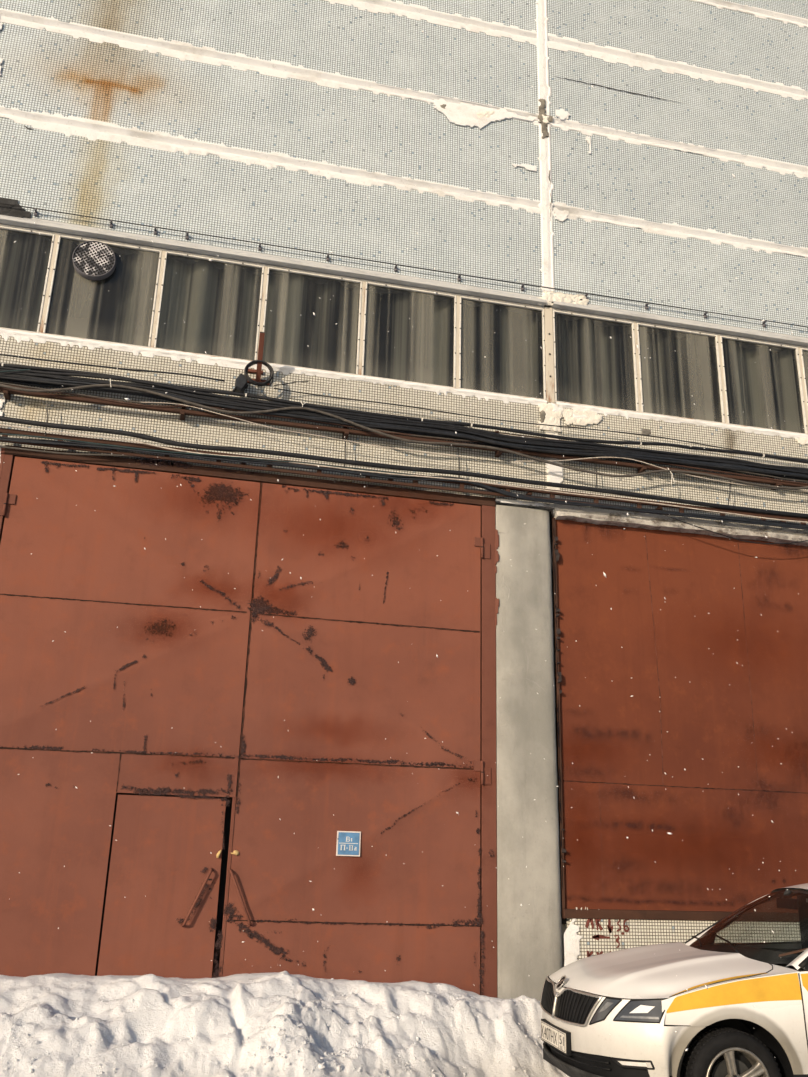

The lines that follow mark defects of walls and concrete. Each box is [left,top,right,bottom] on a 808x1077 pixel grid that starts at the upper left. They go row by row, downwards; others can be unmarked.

peeling [457,116,480,125]
peeling [539,403,587,423]
corrosion [41,457,249,519]
corrosion [282,480,454,530]
corrosion [144,617,176,640]
corrosion [201,566,332,679]
corrosion [120,731,477,849]
corrosion [209,868,485,996]